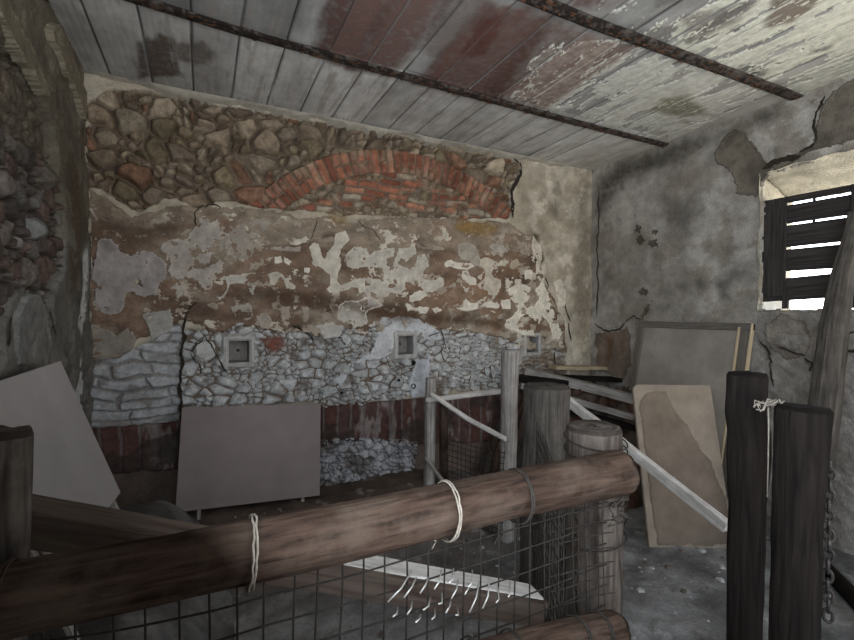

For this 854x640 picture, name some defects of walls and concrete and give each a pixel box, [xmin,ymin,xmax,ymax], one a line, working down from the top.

leakage [139,34,211,77]
peeling [315,0,438,73]
peeling [424,0,854,198]
spalling [0,0,64,366]
peeling [44,22,567,486]
crack [595,195,641,332]
crack [759,341,813,387]